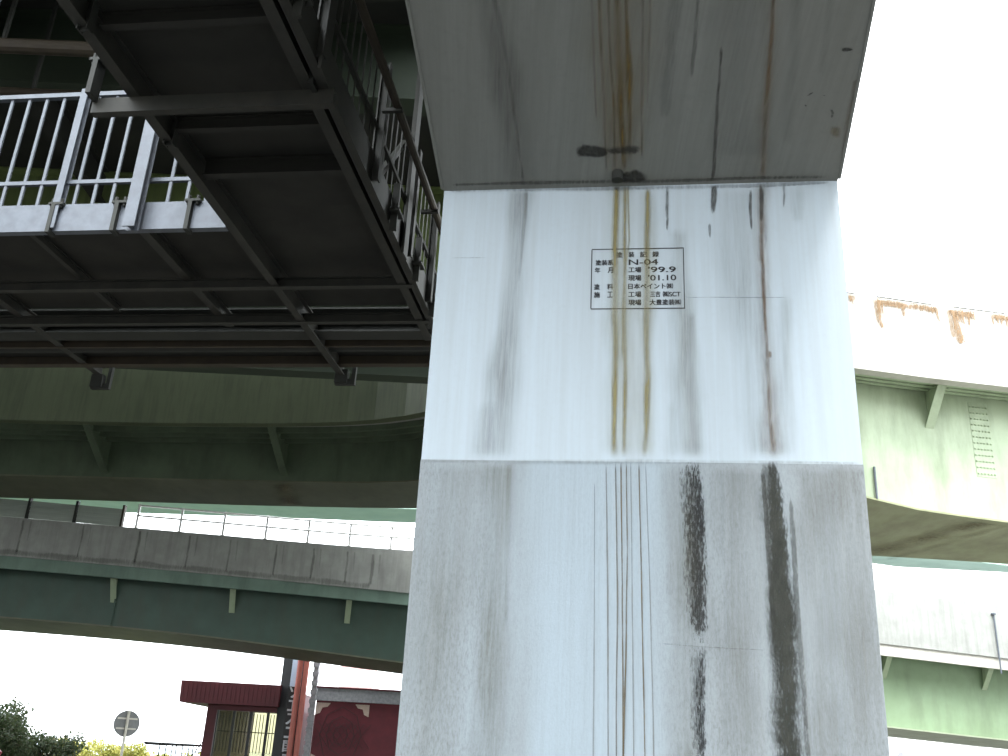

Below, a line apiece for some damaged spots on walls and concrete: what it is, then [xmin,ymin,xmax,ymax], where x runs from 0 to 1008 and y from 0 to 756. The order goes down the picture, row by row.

corrosion [613,188,629,274]
corrosion [612,317,626,447]
corrosion [874,299,978,344]
damp [684,462,708,756]
damp [761,464,810,756]